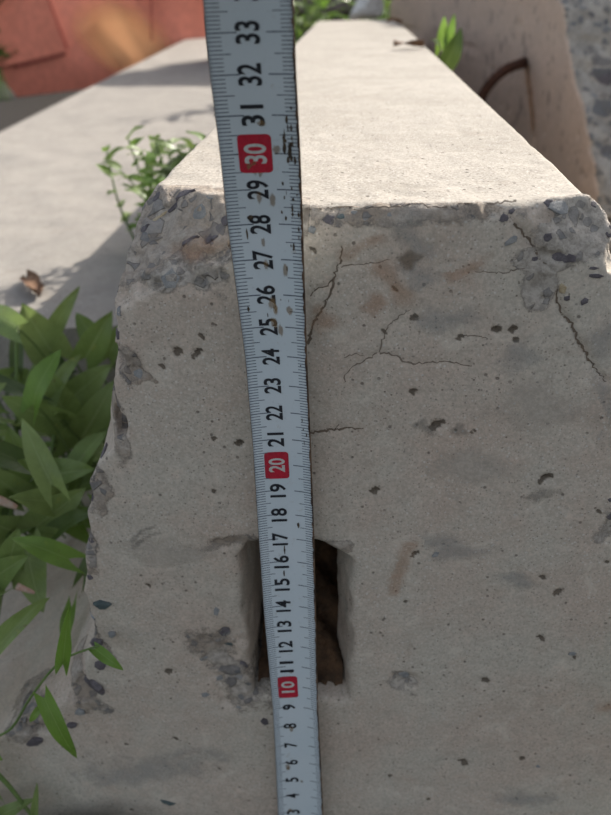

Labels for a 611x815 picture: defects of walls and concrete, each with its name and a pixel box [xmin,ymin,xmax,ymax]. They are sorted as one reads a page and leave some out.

spalling [117,185,232,296]
crack [307,247,389,344]
crack [343,310,472,382]
crack [475,223,546,274]
spalling [499,207,527,222]
spalling [511,194,611,311]
crack [556,290,606,382]
spalling [185,627,273,712]